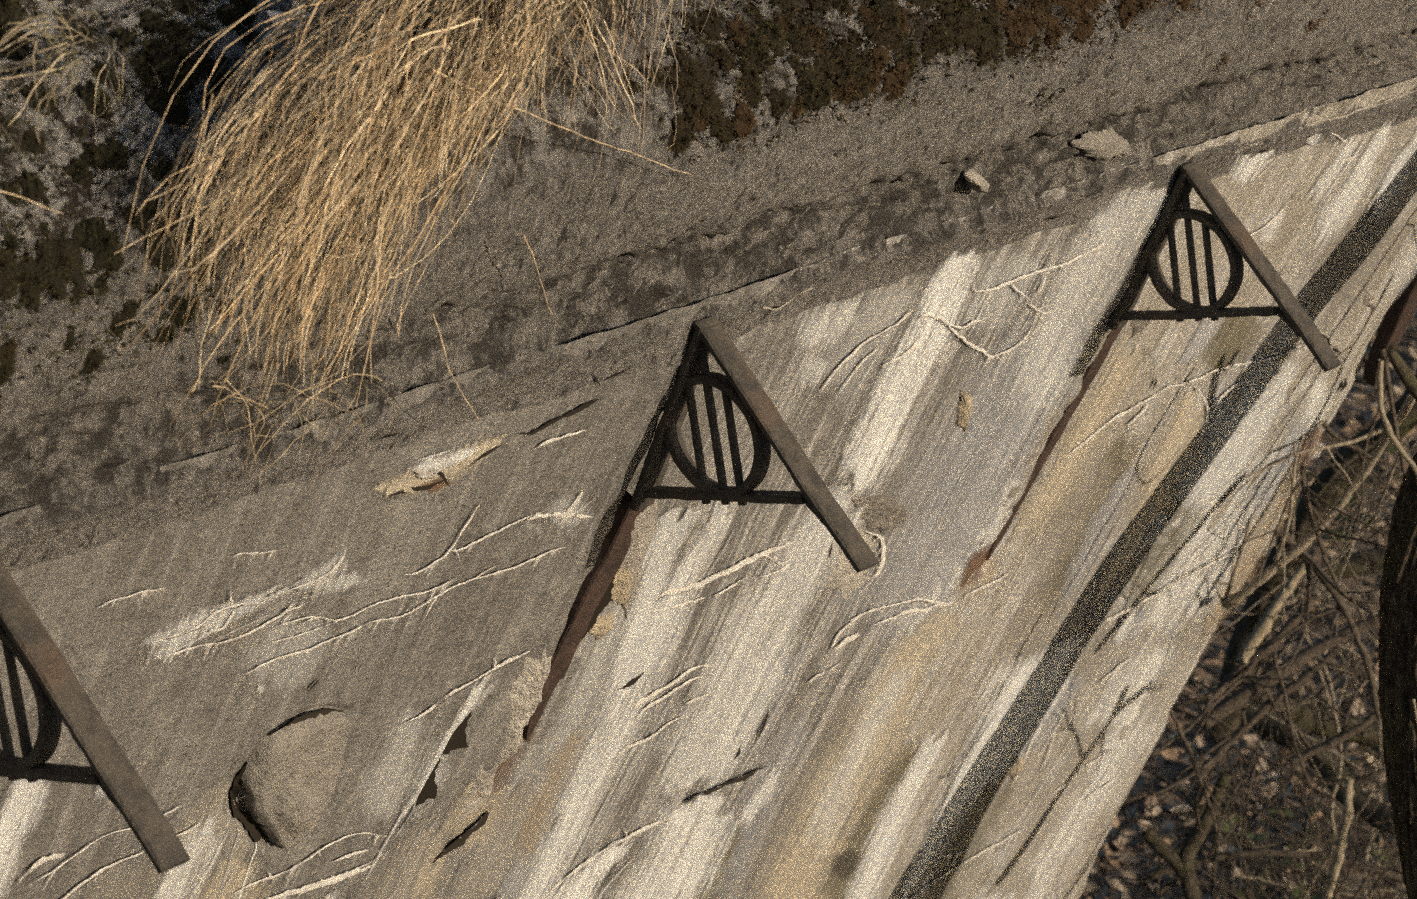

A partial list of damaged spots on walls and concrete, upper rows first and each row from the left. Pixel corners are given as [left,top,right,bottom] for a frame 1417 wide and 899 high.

crack [820,242,1105,393]
water stain [0,779,49,895]
water stain [147,780,267,899]
spalling [241,710,351,849]
crack [148,492,595,899]
water stain [369,674,491,899]
water stain [453,502,835,899]
crack [614,665,714,762]
crack [627,539,803,620]
crack [809,572,1009,682]
water stain [764,183,1167,899]
water stain [899,357,1335,899]